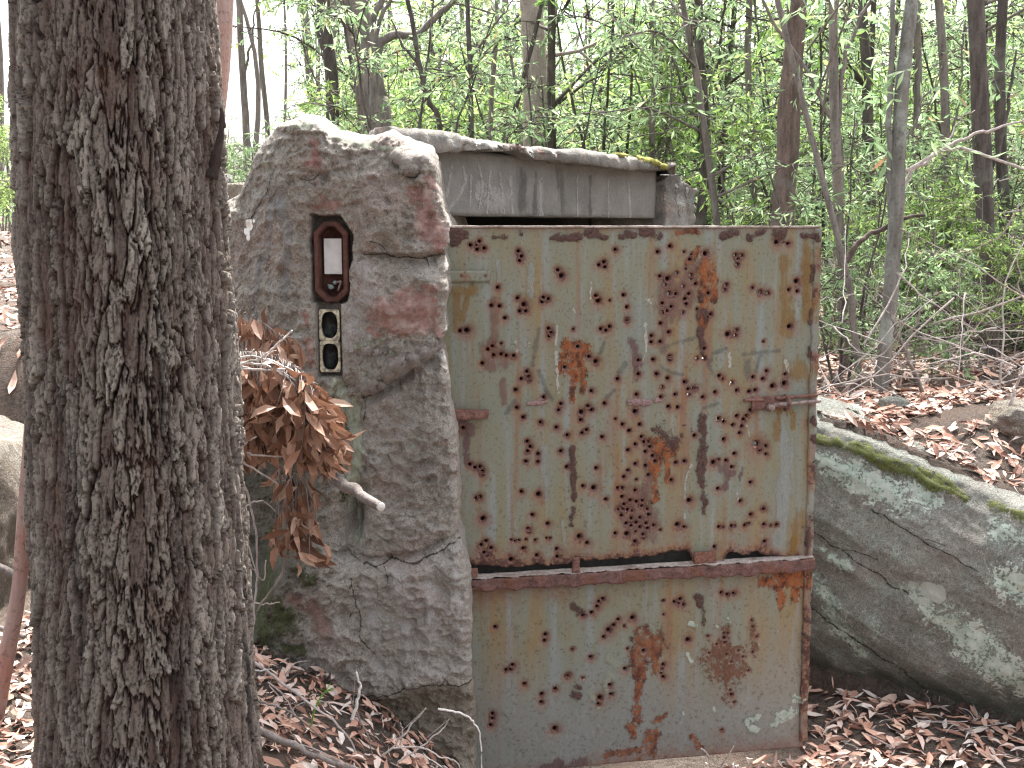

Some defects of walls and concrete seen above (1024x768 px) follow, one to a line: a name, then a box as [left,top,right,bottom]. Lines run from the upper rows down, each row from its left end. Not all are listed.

rust [449,228,470,248]
rust [549,228,719,360]
rust [719,228,822,336]
rust [556,337,592,404]
rust [621,412,743,536]
rust [789,513,815,556]
crack [346,537,461,659]
rust [603,625,669,758]
rust [693,593,759,704]